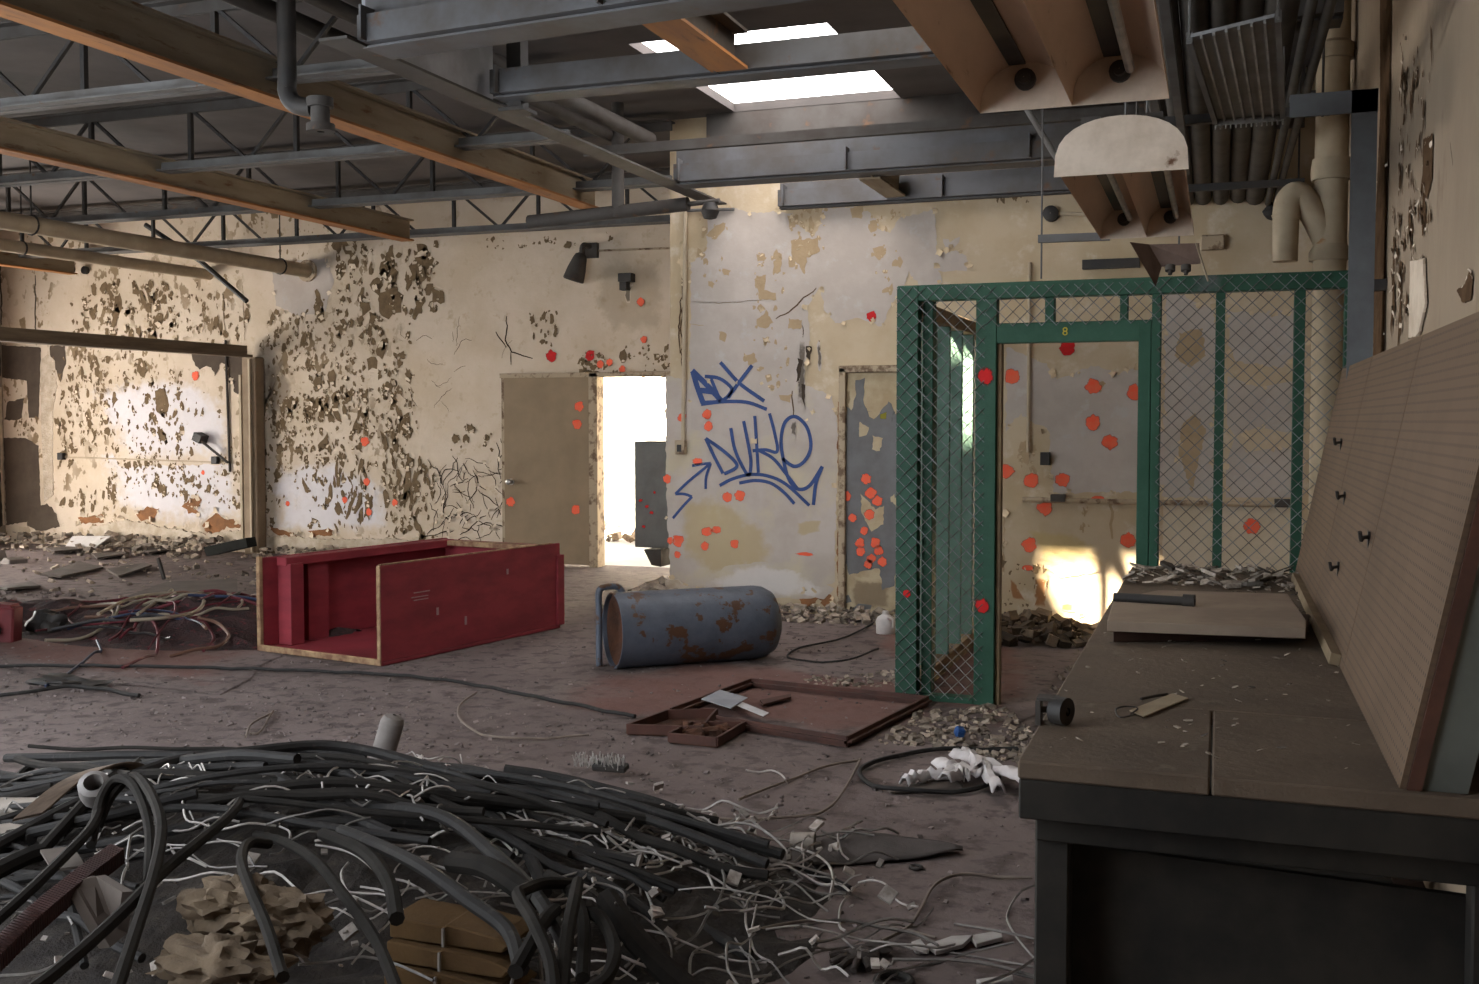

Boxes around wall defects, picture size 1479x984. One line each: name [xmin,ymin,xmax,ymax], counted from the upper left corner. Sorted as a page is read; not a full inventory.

peeling [0,240,445,552]
peeling [450,423,494,452]
peeling [486,236,576,250]
peeling [577,205,973,612]
spalling [1373,0,1433,356]